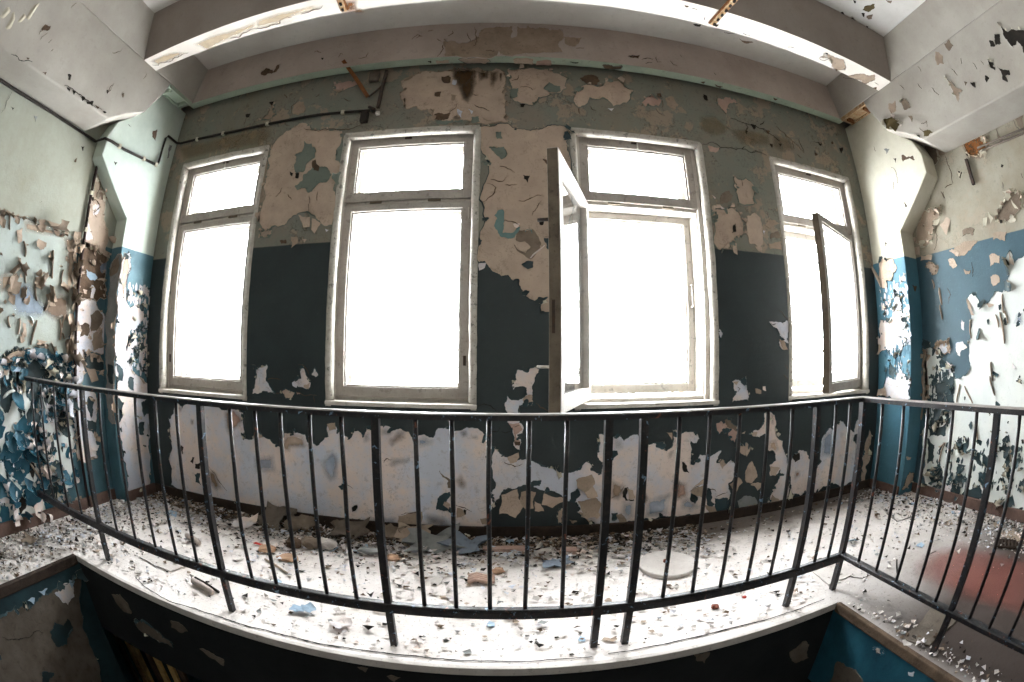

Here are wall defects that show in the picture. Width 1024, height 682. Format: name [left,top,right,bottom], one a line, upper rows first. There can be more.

water stain [454,70,501,100]
peeling [935,22,1024,103]
peeling [244,94,344,248]
peeling [399,25,678,313]
peeling [711,175,782,255]
peeling [0,177,151,526]
peeling [769,310,793,350]
peeling [871,85,1024,510]
peeling [168,364,873,536]
peeling [0,569,102,682]